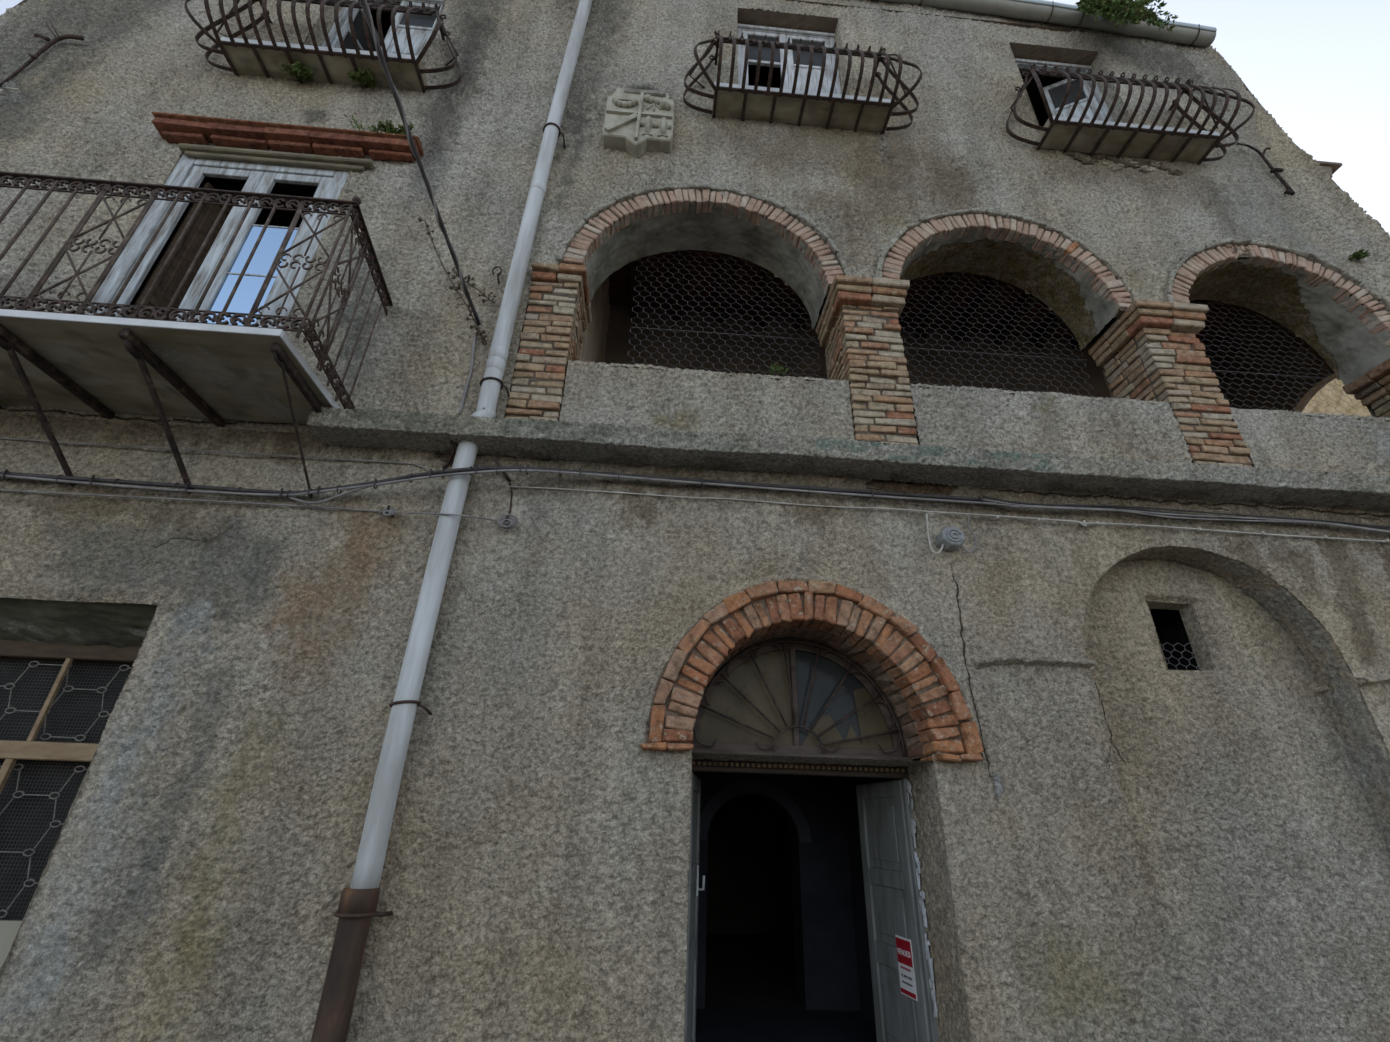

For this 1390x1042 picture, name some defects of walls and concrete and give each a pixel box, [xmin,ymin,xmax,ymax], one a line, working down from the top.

crack [951,567,991,777]